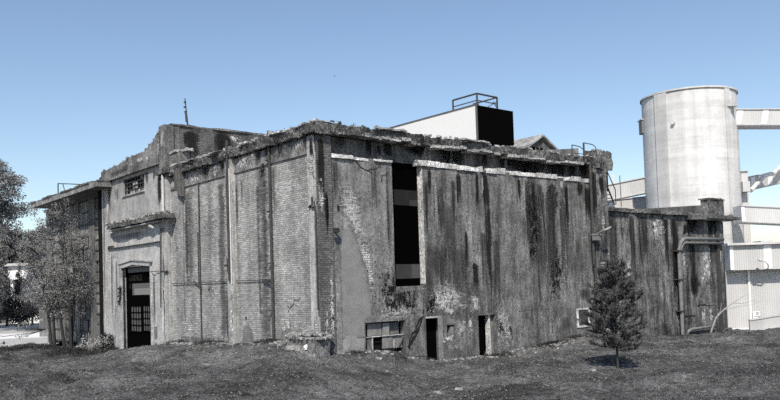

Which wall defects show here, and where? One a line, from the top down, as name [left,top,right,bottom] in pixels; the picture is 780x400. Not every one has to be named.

water stain [183,130,199,158]
water stain [214,133,231,151]
water stain [185,184,242,342]
water stain [256,148,291,338]
peeling [339,183,479,343]
water stain [425,170,461,232]
water stain [455,156,500,304]
water stain [500,158,604,292]
water stain [629,216,645,266]
water stain [664,218,697,309]
water stain [690,244,700,298]